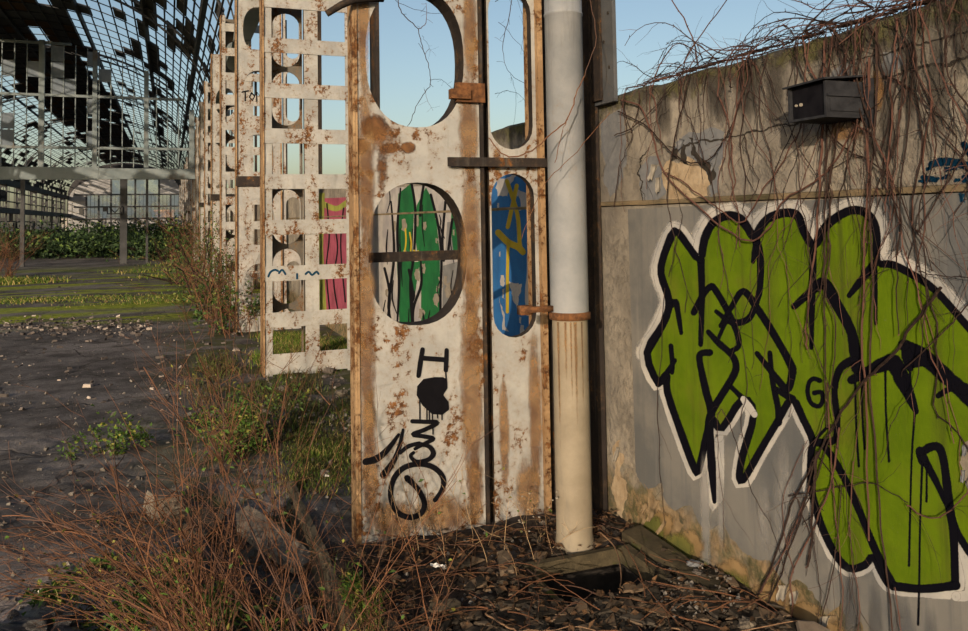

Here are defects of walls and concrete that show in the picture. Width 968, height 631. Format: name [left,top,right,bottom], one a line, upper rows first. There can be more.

rust [357,2,369,85]
rust [464,0,477,77]
flaking render [639,127,725,200]
rust [358,98,482,539]
rust [557,322,583,406]
rust [500,340,542,515]
flaking render [611,440,628,518]
spalling [520,484,729,605]
spalling [776,584,800,606]